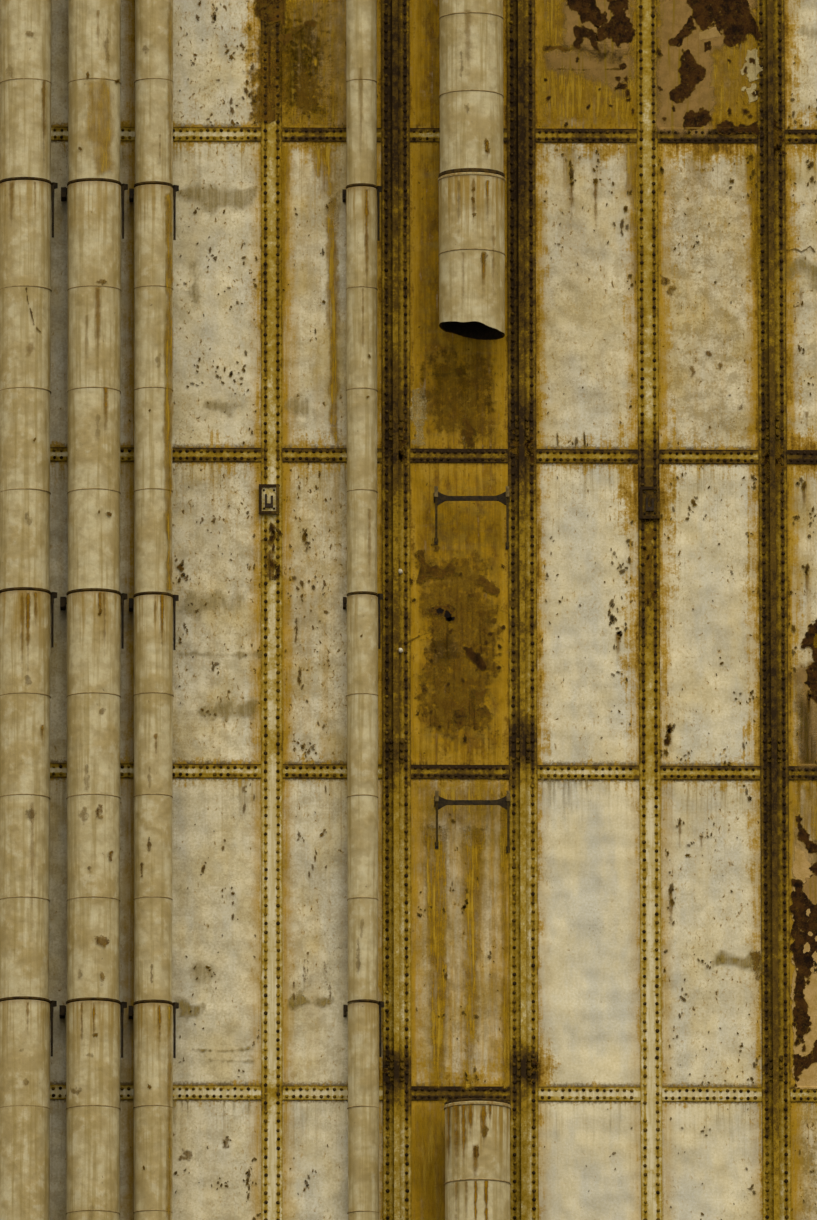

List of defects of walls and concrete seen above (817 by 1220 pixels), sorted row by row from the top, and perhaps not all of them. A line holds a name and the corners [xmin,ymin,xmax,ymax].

corrosion [223,0,338,236]
peeling [538,0,637,128]
peeling [655,0,763,137]
corrosion [309,143,340,442]
peeling [794,619,817,768]
peeling [789,787,817,1089]